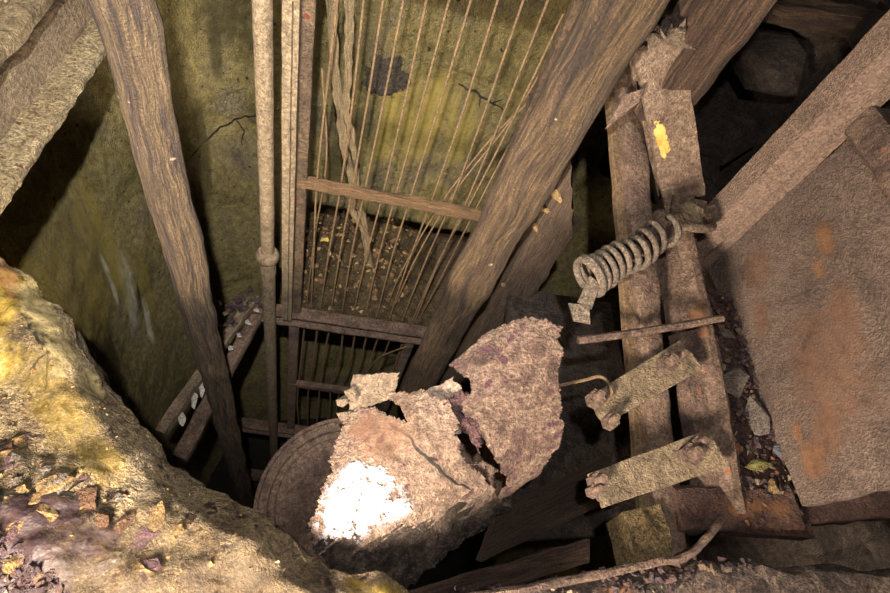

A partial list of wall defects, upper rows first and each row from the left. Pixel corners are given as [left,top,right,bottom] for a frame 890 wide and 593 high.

crack [458,83,504,110]
crack [191,115,256,157]